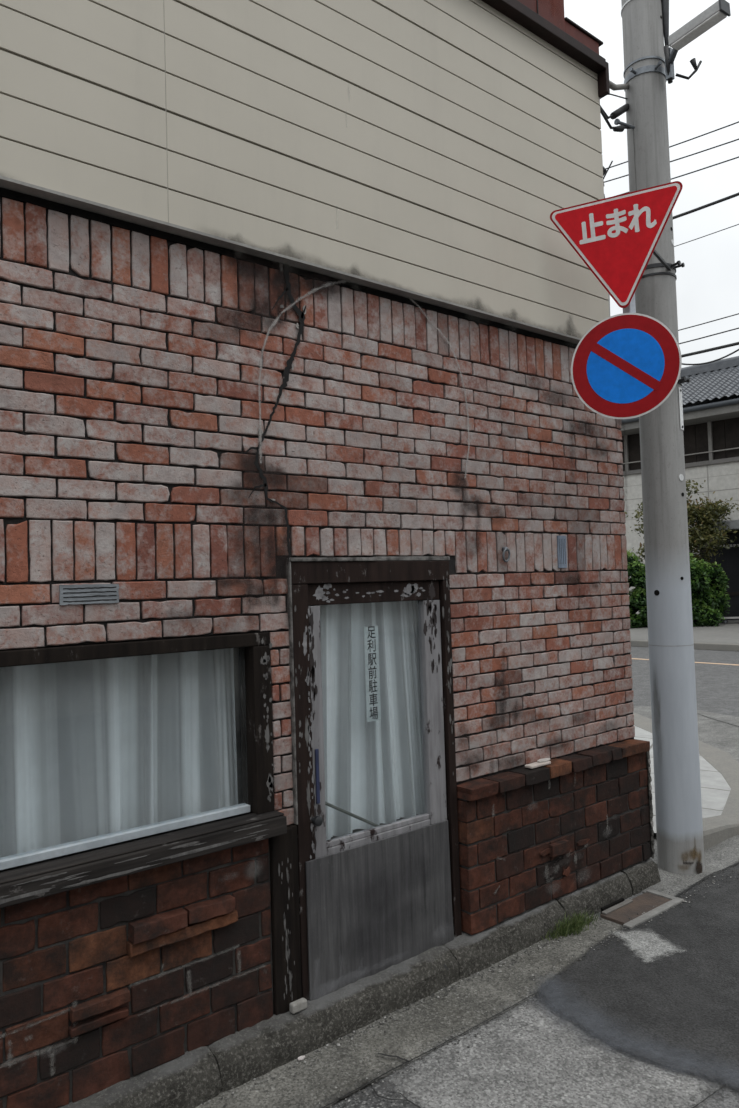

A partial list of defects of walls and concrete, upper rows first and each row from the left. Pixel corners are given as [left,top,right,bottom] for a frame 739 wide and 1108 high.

crack [244,263,347,562]
crack [408,297,470,478]
peeling [294,572,452,859]
peeling [0,824,269,904]
rust [683,850,702,874]